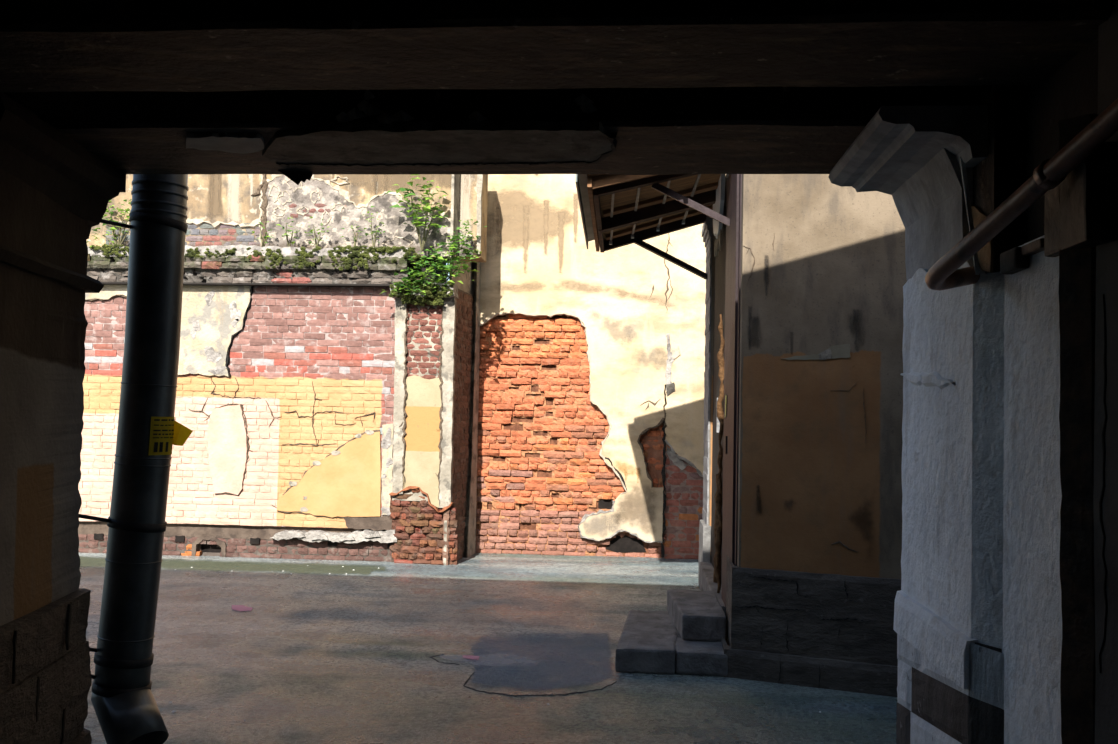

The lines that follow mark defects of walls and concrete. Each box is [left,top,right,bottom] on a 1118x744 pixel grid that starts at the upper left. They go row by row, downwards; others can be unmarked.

flaking render [105,221,131,247]
flaking render [178,285,254,377]
flaking render [185,132,618,257]
water stain [494,191,653,300]
crack [650,233,673,310]
crack [189,304,408,486]
flaking render [277,424,458,565]
crack [435,302,444,505]
flaking render [475,312,703,559]